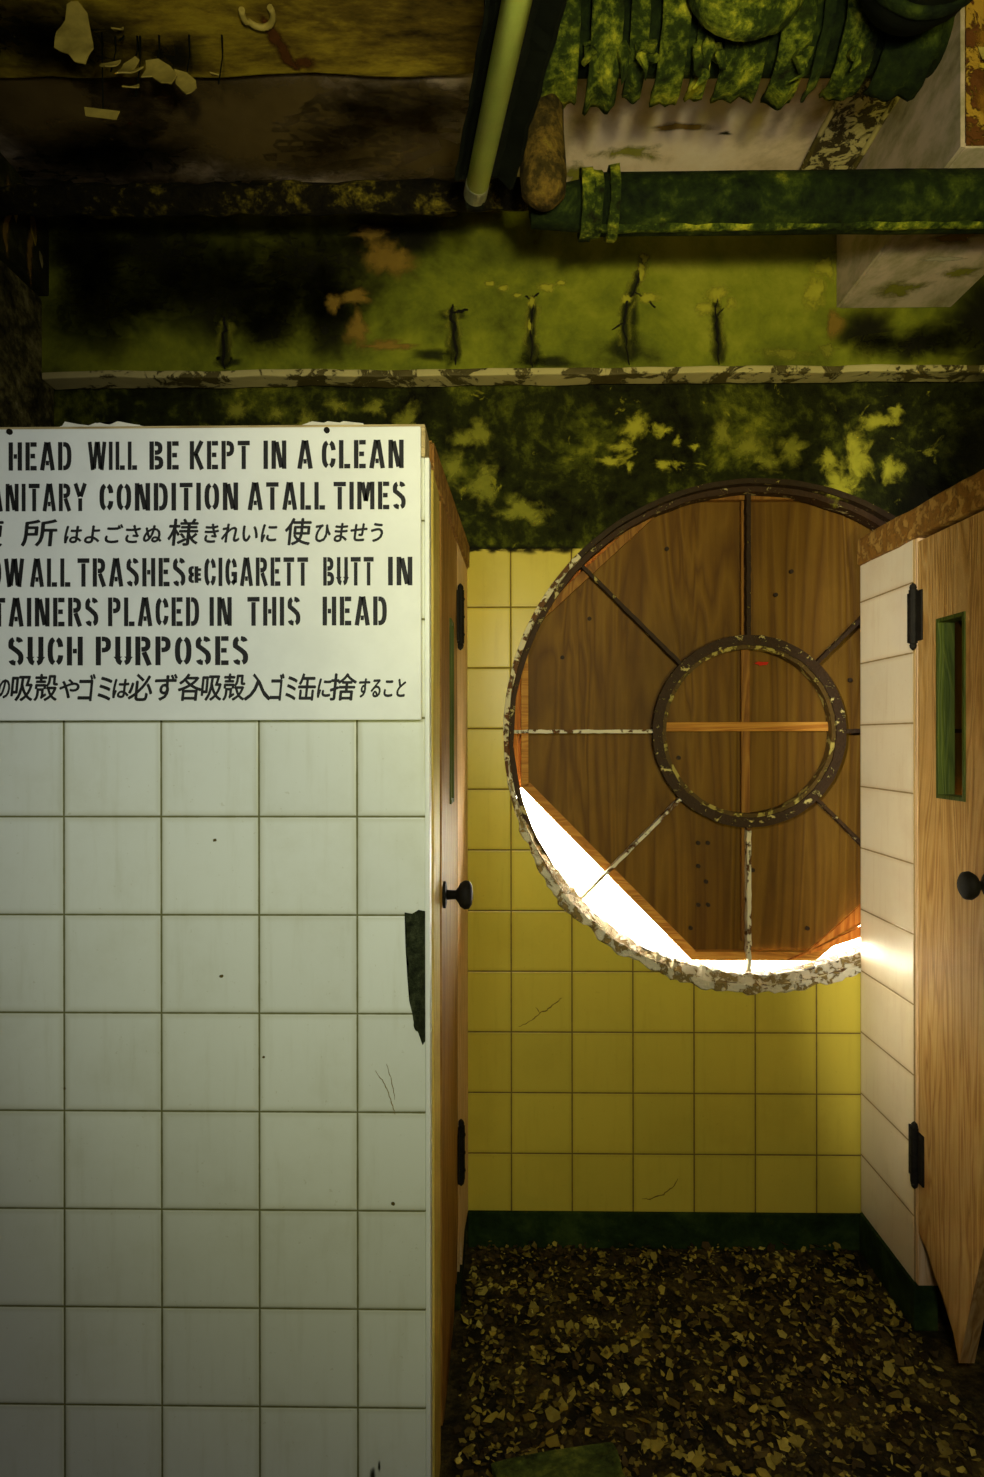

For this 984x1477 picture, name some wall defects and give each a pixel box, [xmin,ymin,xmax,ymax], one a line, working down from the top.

peeling [54,1,223,120]
corrosion [238,4,315,70]
damp [0,73,469,186]
damp [49,215,441,353]
damp [839,234,984,379]
damp [902,414,984,512]
spalling [405,910,425,1045]